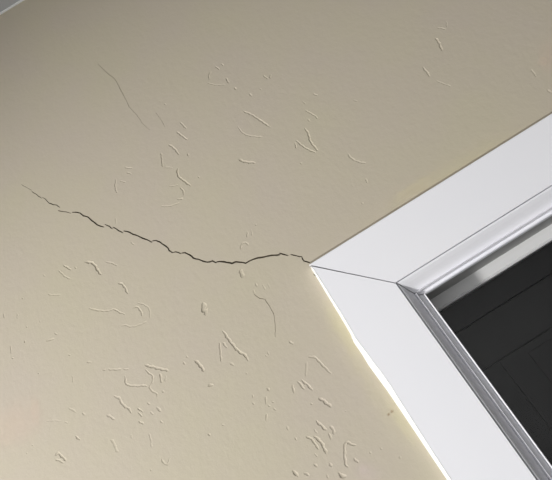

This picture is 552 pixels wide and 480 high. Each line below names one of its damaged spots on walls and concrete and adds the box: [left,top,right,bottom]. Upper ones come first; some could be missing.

crack [24,186,423,295]